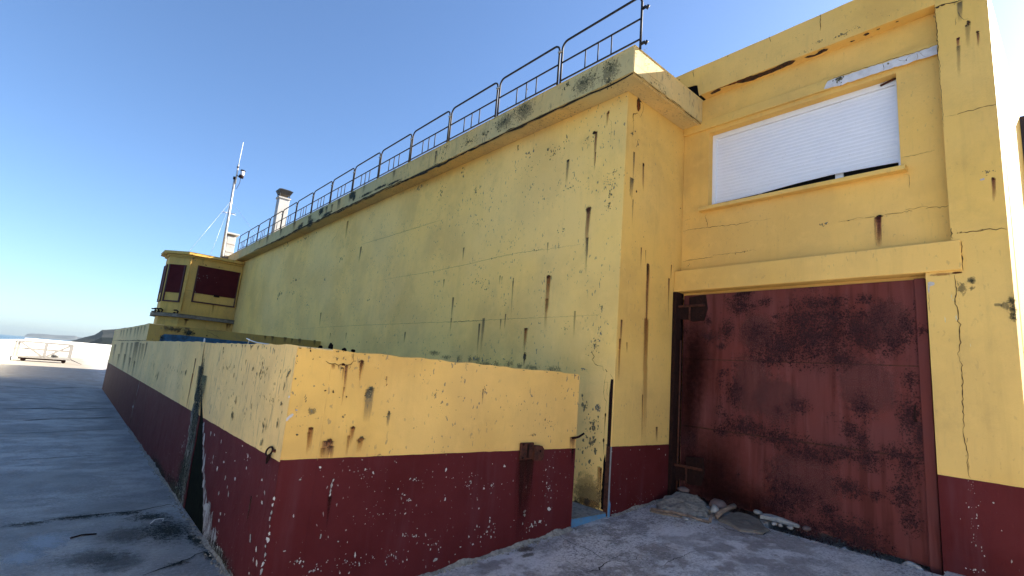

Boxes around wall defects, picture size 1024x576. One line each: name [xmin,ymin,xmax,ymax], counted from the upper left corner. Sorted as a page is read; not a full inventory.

mould [562,57,615,91]
spalling [824,45,937,89]
corrosion [641,247,650,355]
crack [885,151,1004,477]
corrosion [308,427,334,453]
corrosion [822,300,927,540]
spalling [249,479,275,575]
corrosion [761,484,898,561]